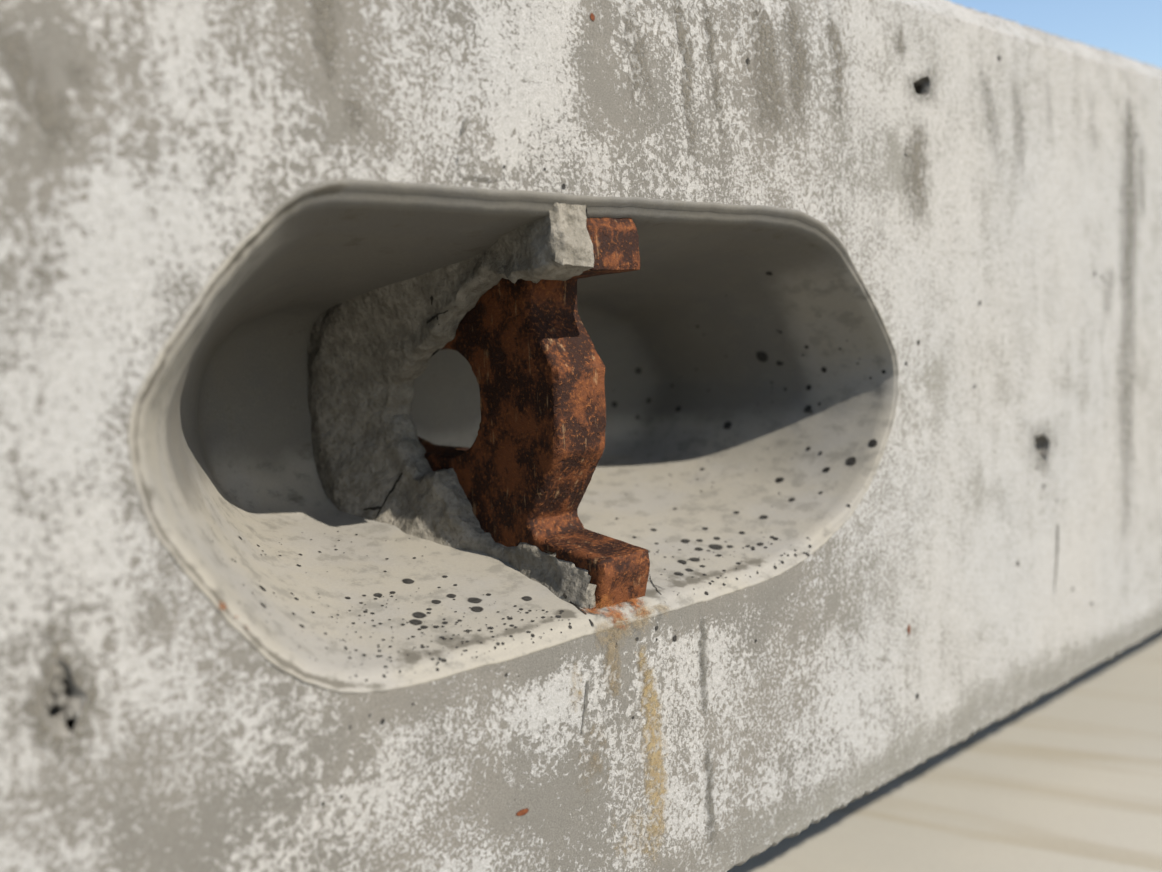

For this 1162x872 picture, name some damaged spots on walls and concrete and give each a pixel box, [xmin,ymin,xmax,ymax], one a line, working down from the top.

spalling [291,575,572,681]
rust [586,594,649,627]
rust [640,652,666,833]